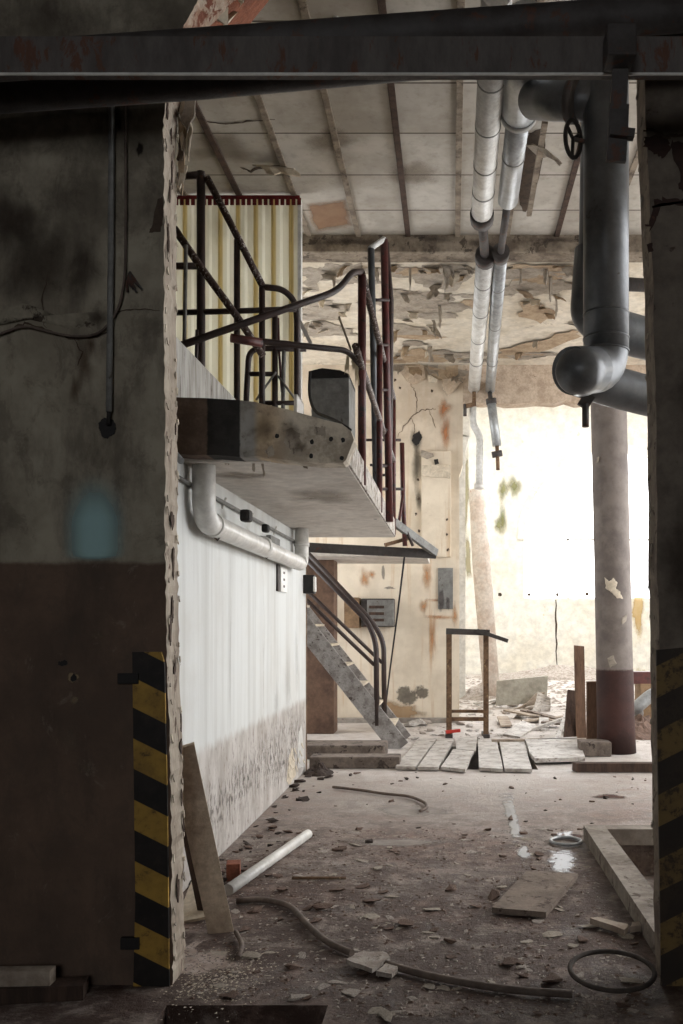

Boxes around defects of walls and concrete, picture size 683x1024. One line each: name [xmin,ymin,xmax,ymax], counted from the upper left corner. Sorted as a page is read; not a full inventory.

peeling [149,101,196,291]
peeling [302,263,475,395]
peeling [483,264,581,363]
crack [398,386,435,435]
peeling [166,470,183,762]
peeling [604,577,623,599]
peeling [173,854,186,961]